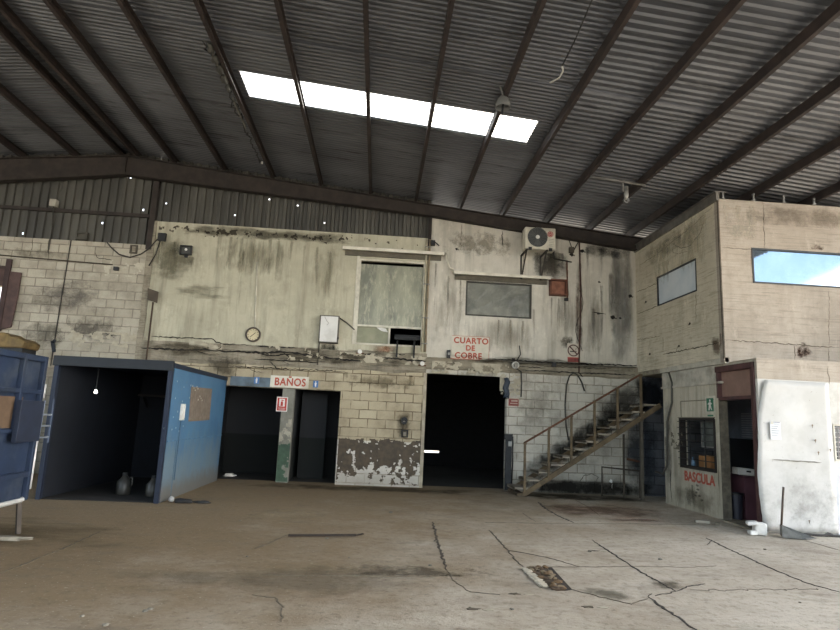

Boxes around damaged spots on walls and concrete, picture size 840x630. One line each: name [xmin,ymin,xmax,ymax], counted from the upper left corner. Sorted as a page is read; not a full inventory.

damp [159,225,352,244]
peeling [189,341,223,352]
peeling [276,419,292,482]
peeling [336,438,421,486]
crack [265,522,500,595]
crack [489,530,839,630]